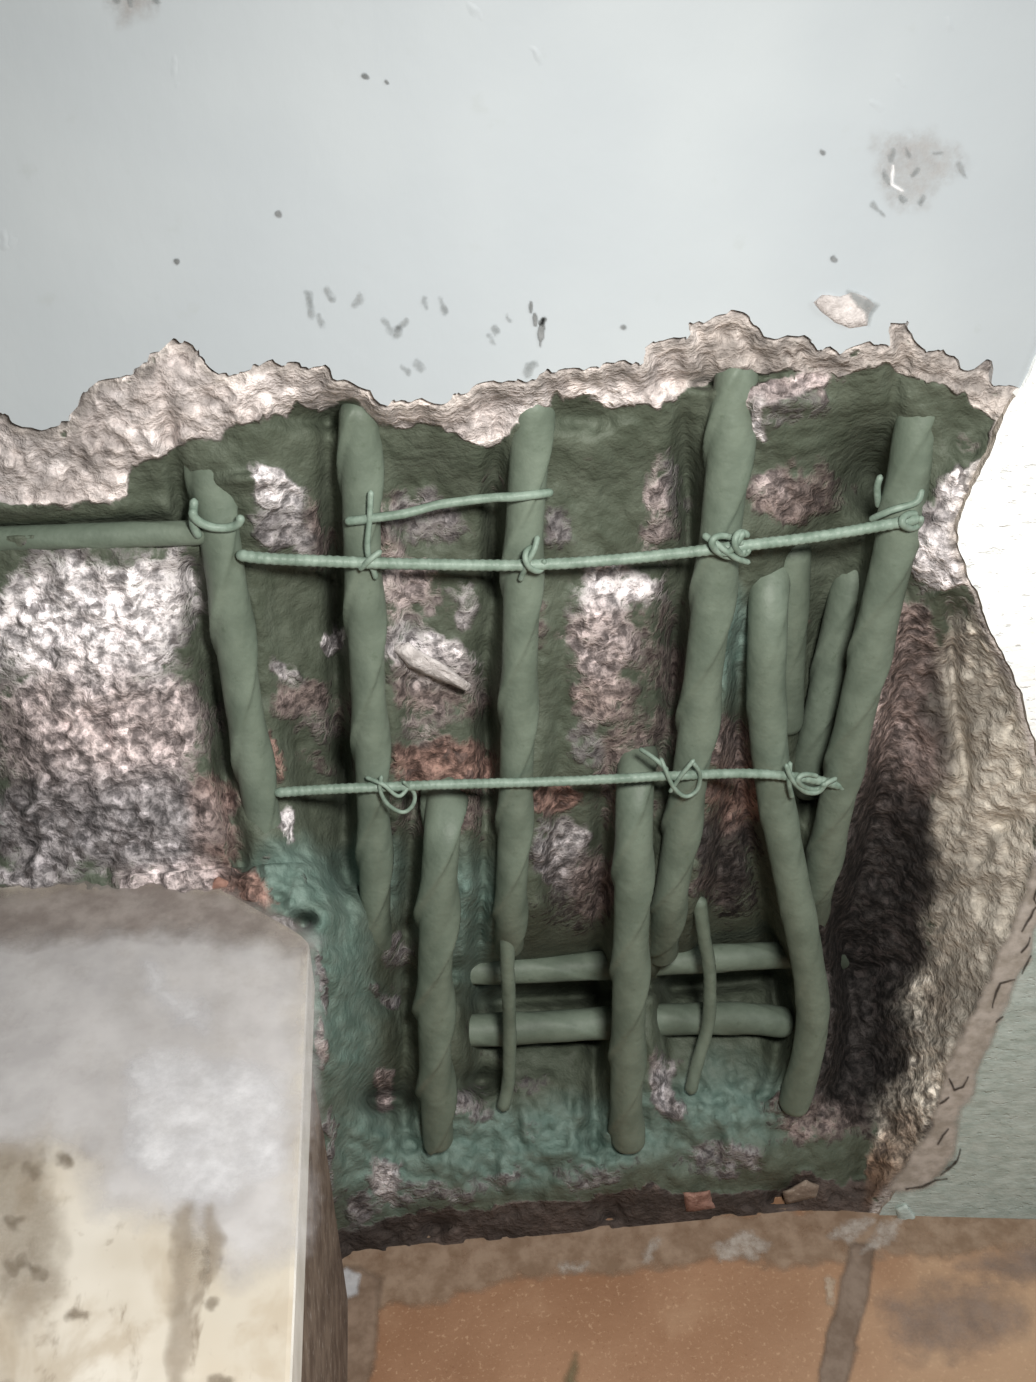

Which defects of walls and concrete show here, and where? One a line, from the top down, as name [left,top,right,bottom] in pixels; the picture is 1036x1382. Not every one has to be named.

spalling [0,292,1036,1259]
water stain [0,927,300,1268]
crack [820,1243,874,1382]